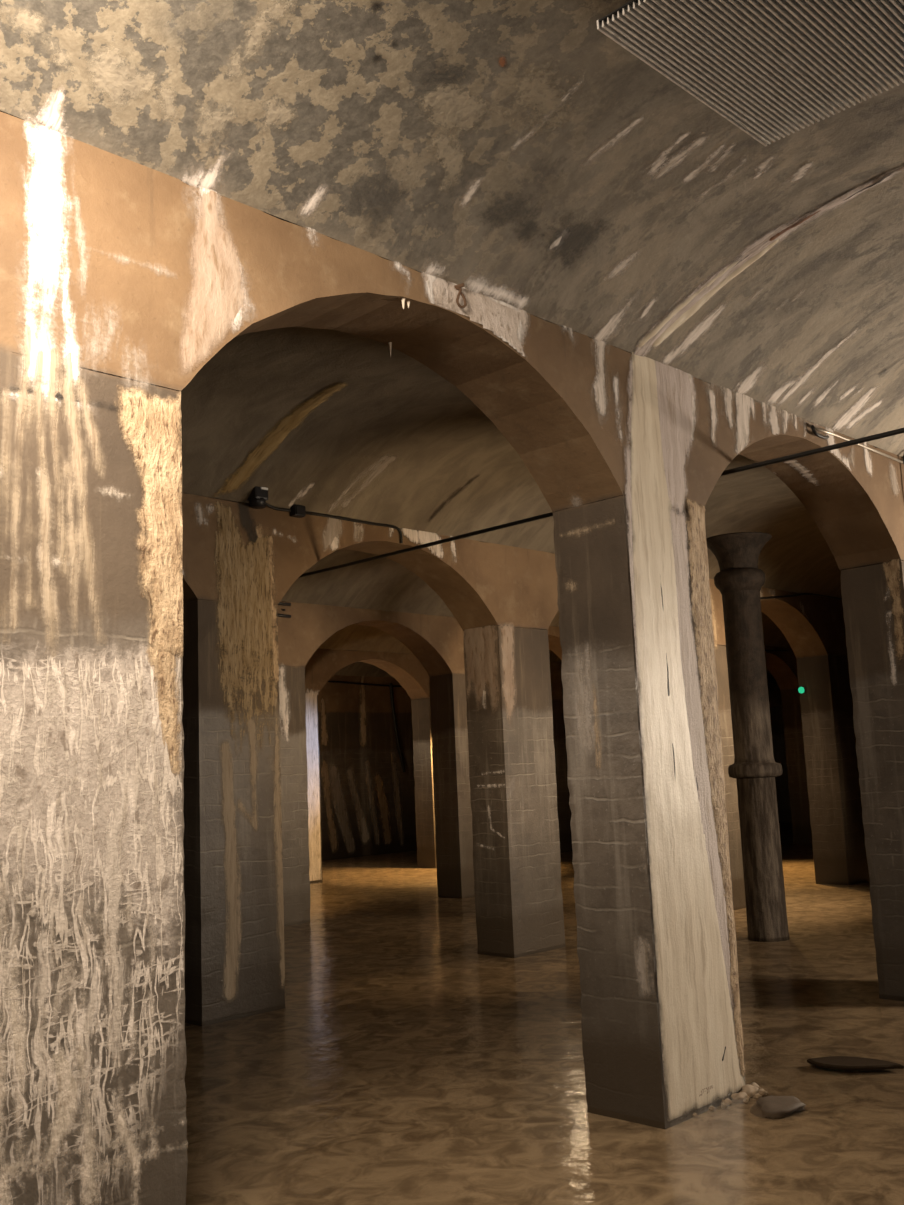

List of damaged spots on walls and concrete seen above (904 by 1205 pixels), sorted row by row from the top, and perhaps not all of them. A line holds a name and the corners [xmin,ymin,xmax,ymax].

water stain [301,188,325,236]
water stain [463,180,480,204]
water stain [590,119,640,160]
water stain [649,133,745,195]
water stain [792,163,812,181]
water stain [634,168,903,364]
water stain [594,301,631,438]
water stain [709,330,882,473]
water stain [890,466,898,494]
spalling [119,388,183,774]
water stain [0,91,184,1205]